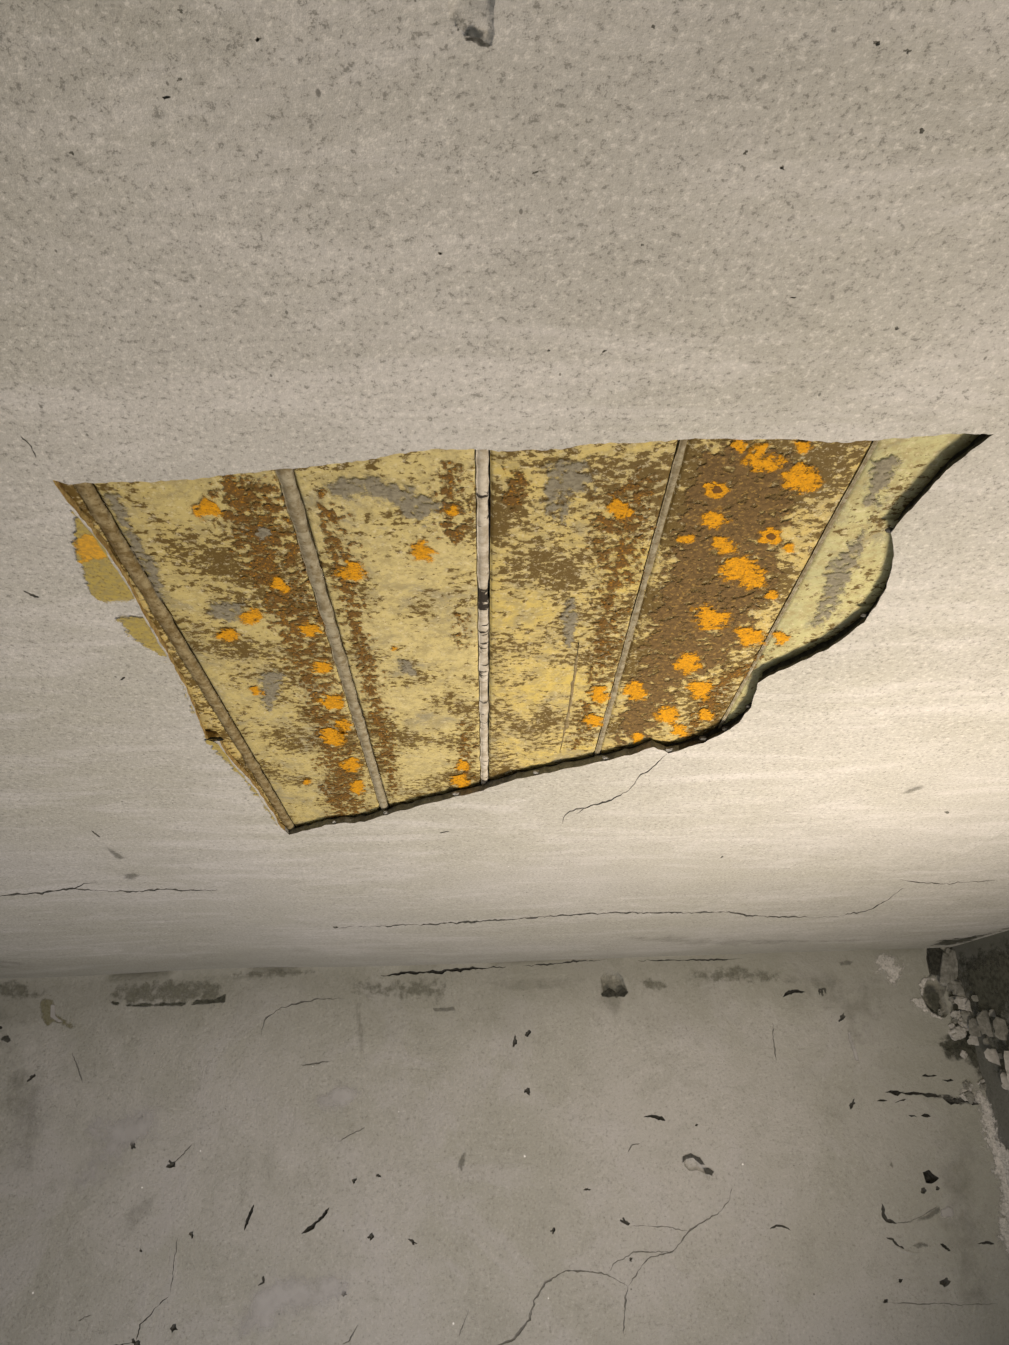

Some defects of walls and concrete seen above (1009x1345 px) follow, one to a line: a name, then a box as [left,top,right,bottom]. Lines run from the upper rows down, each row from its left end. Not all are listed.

spalling [53,480,892,835]
spalling [885,434,993,533]